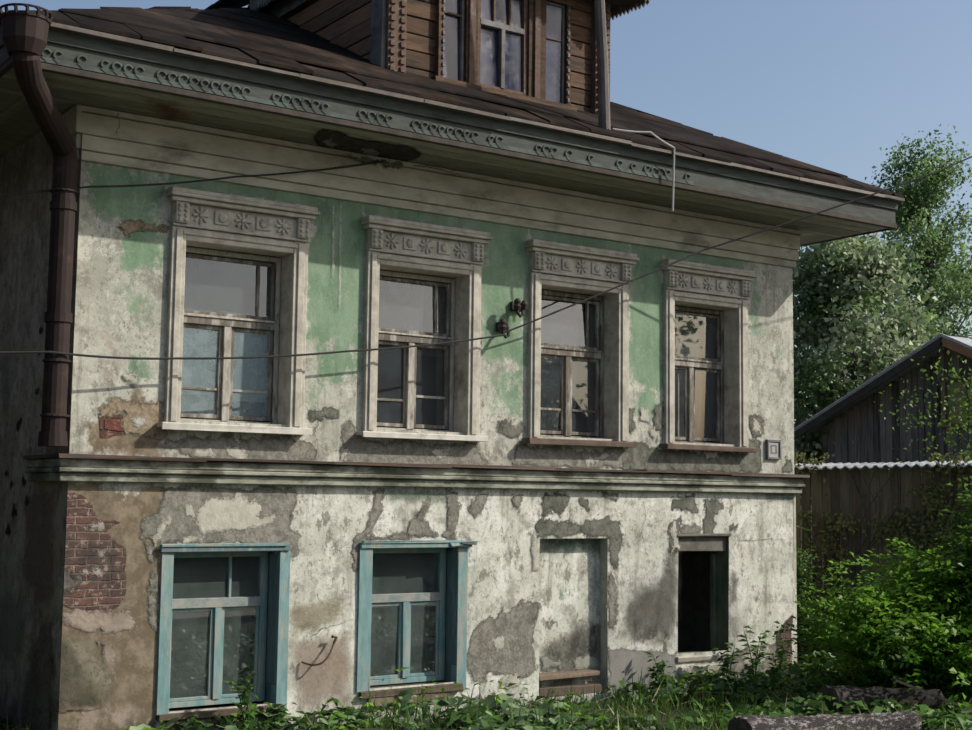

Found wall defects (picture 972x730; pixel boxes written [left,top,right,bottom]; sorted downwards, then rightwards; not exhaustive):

flaking render [118,219,171,237]
flaking render [97,370,317,461]
flaking render [307,406,489,465]
flaking render [4,471,139,680]
flaking render [139,485,302,631]
flaking render [351,487,489,572]
flaking render [511,494,524,513]
flaking render [528,491,624,629]
flaking render [667,493,724,554]
flaking render [467,599,541,689]
flaking render [730,615,793,685]